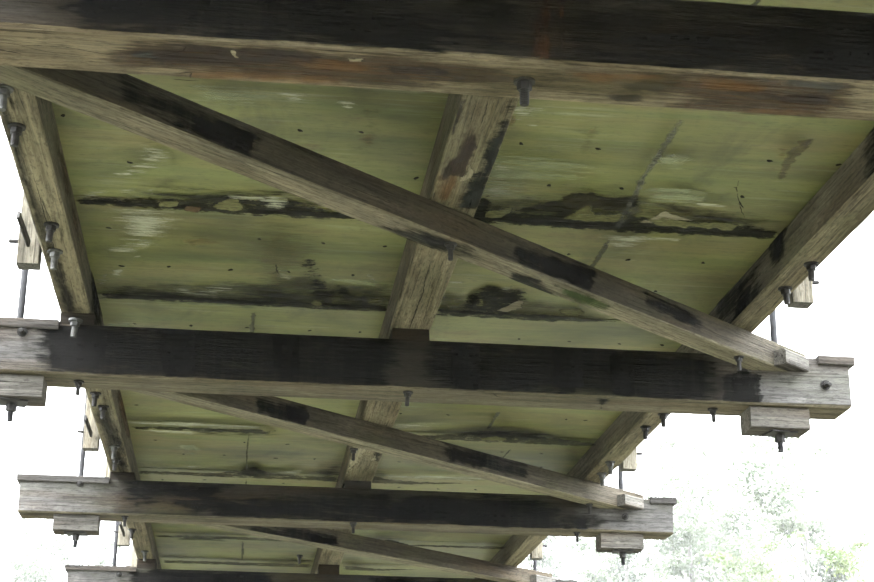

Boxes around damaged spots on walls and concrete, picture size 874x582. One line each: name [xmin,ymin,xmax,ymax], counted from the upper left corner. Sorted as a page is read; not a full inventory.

damp [72,189,354,231]
damp [459,105,787,265]
damp [436,246,607,322]
damp [644,291,702,328]
damp [717,266,762,323]